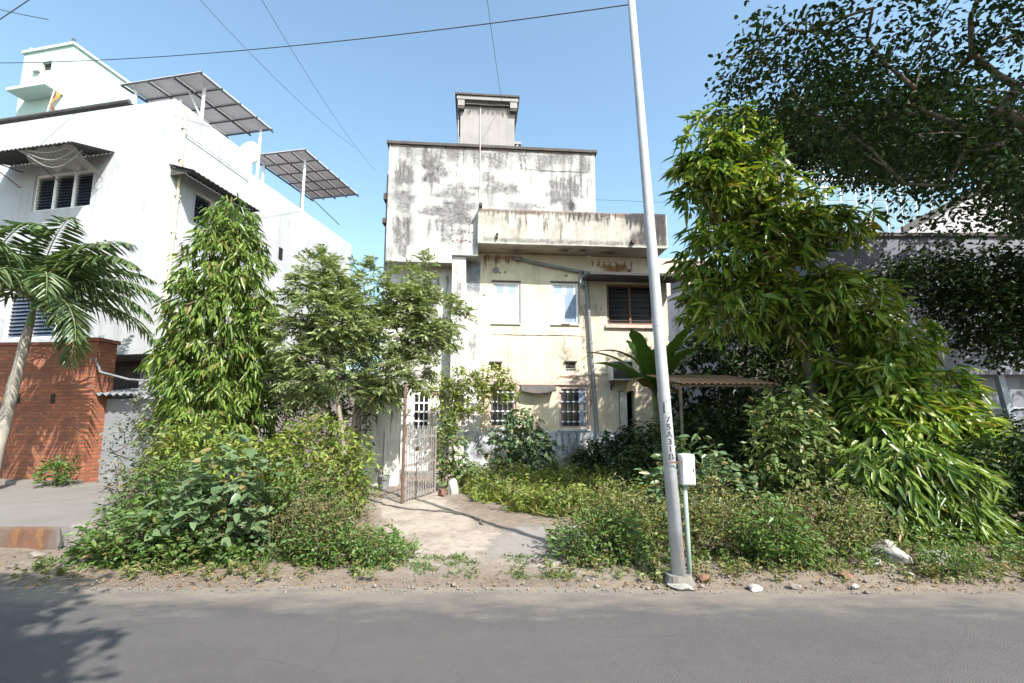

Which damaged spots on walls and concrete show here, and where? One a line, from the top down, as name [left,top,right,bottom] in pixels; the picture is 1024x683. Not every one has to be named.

leakage [393,147,667,257]